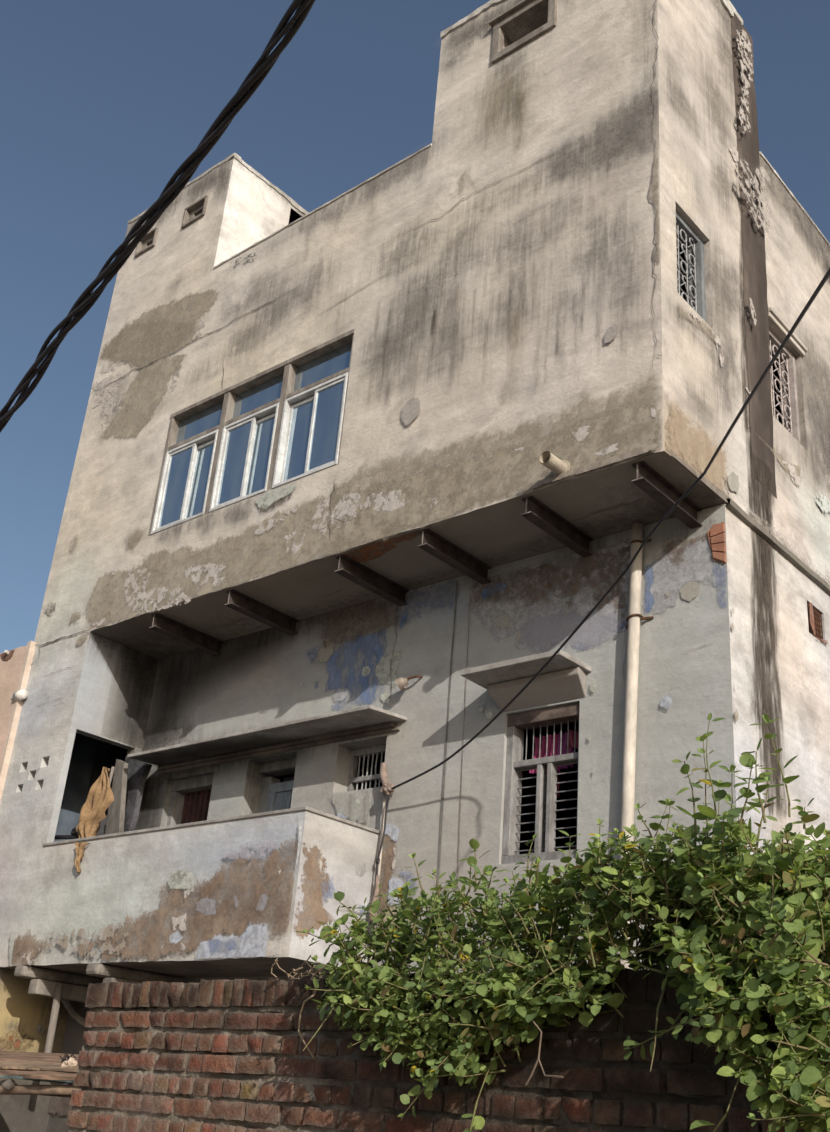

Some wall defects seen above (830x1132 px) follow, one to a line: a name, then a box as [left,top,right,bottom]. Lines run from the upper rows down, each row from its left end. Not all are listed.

peeling [736,23,754,134]
peeling [730,149,775,259]
flaking render [92,289,218,439]
peeling [69,483,408,645]
peeling [470,522,727,653]
spalling [518,443,730,504]
water stain [729,226,786,815]
peeling [299,629,402,711]
flaking render [9,839,335,967]